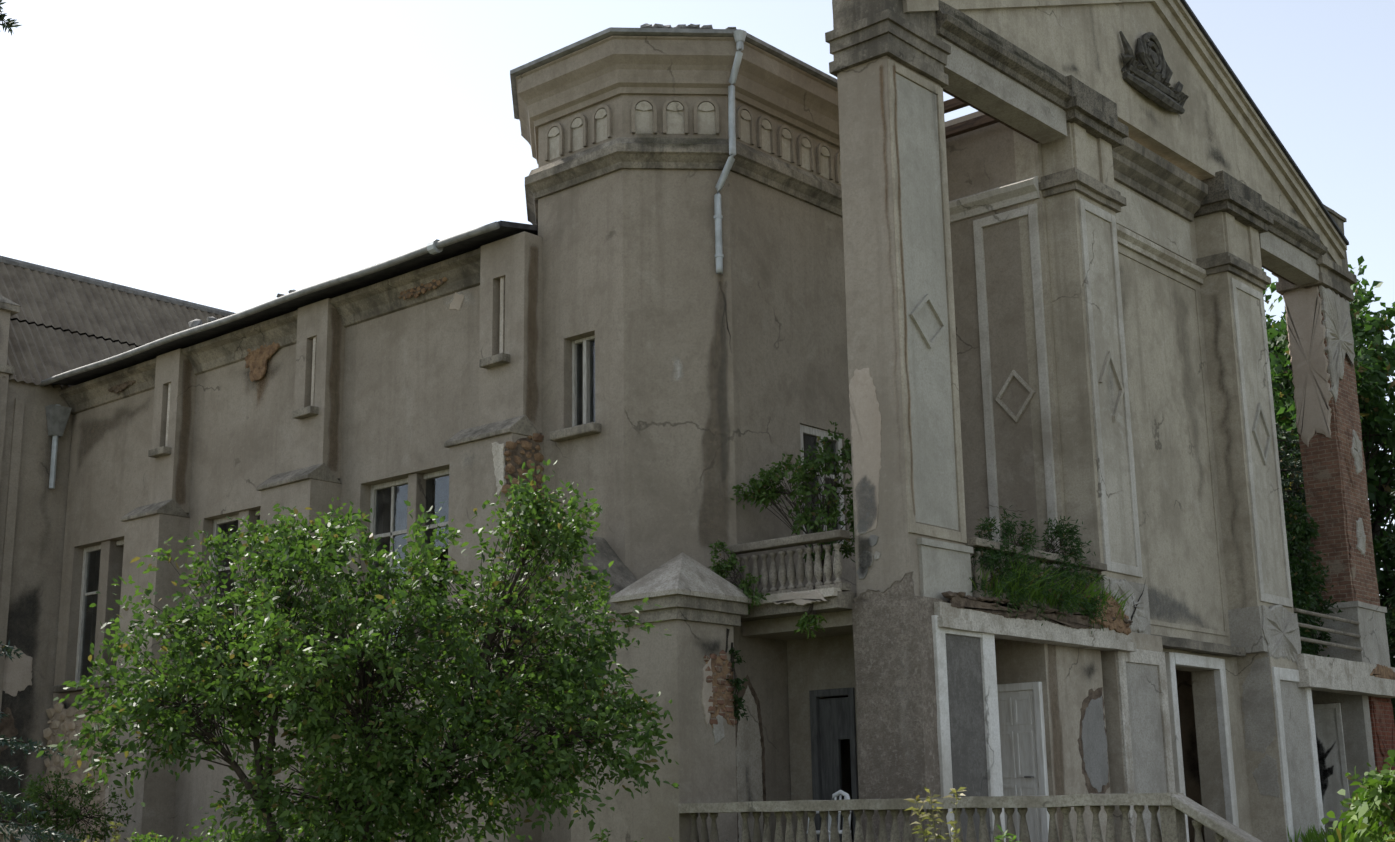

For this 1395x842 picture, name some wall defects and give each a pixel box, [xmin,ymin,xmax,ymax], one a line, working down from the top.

flaking render [492,433,544,559]
flaking render [1283,285,1378,601]
water stain [0,678,33,842]
water stain [5,591,39,661]
flaking render [701,650,737,745]
peeling [1078,687,1110,794]
spalling [1370,664,1395,680]